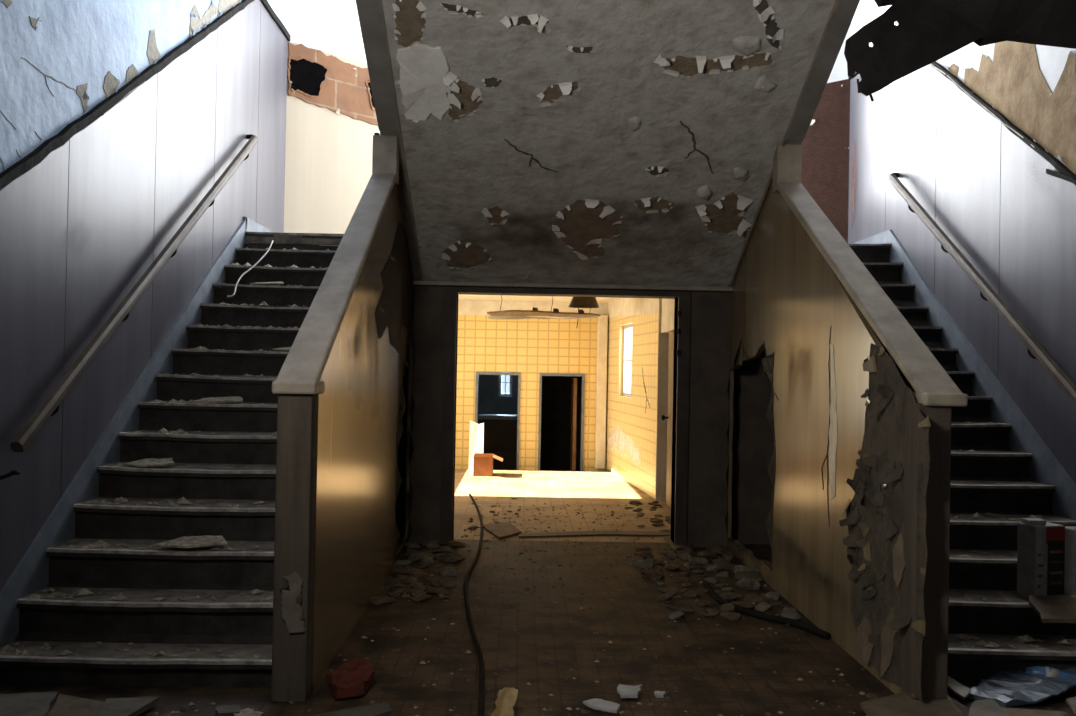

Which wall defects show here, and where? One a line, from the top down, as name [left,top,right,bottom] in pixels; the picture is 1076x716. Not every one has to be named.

crack [21,57,77,97]
peeling [103,64,140,97]
peeling [147,30,161,65]
spalling [287,42,378,125]
peeling [392,0,502,123]
peeling [500,13,549,33]
peeling [654,0,784,78]
peeling [947,41,1076,175]
crack [0,110,42,171]
crack [504,139,557,172]
crack [680,121,713,174]
peeling [829,343,931,701]